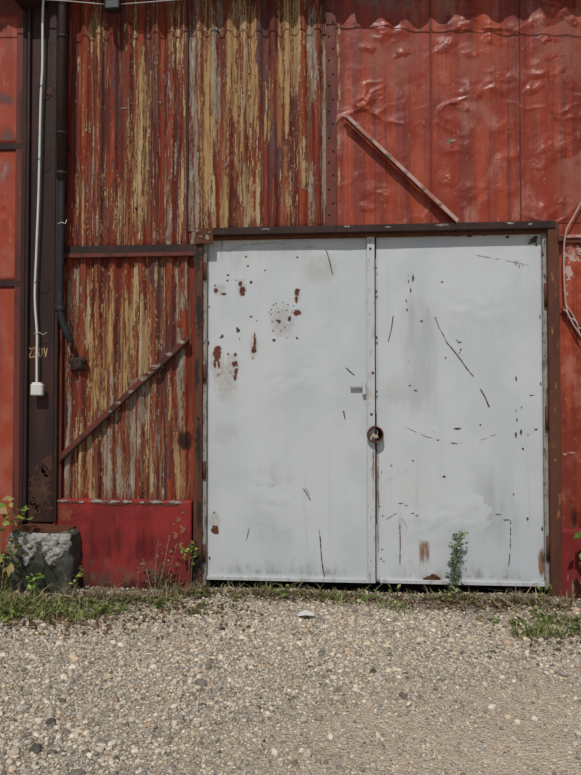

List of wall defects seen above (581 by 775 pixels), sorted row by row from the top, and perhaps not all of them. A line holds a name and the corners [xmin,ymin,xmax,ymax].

peeling [70,0,326,246]
peeling [551,245,581,298]
corrosion [268,288,301,342]
corrosion [213,334,238,380]
peeling [57,256,194,567]
corrosion [28,451,54,523]